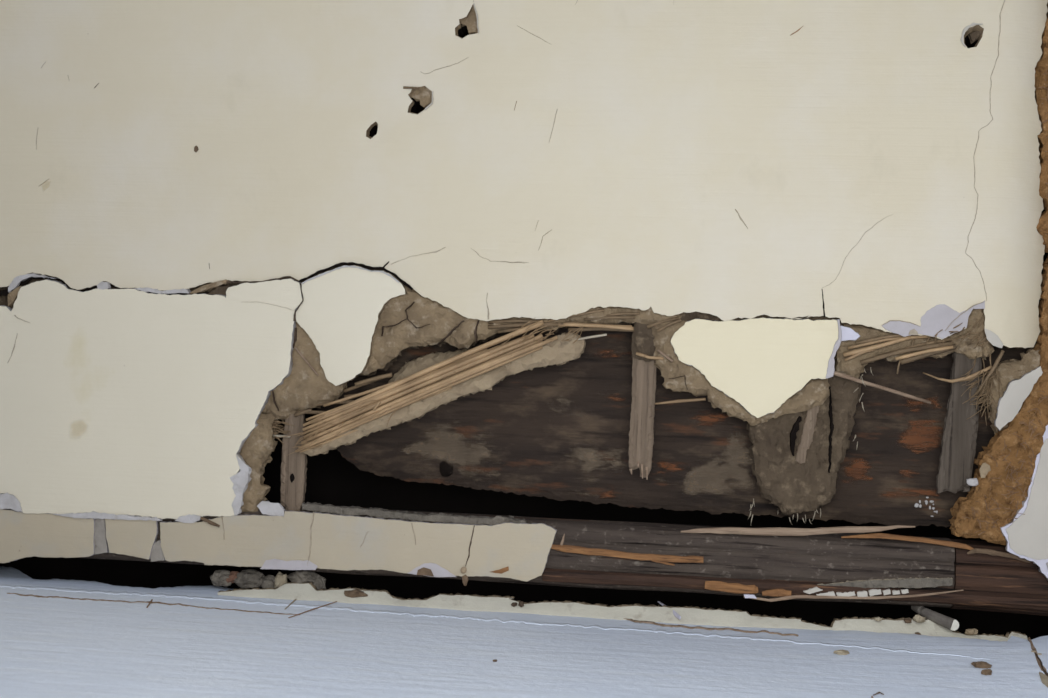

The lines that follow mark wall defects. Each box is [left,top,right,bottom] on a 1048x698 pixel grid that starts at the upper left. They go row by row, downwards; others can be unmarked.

crack [965,0,1005,301]
crack [0,247,446,362]
flaking render [230,3,1048,560]
crack [822,214,893,317]
peeling [803,577,953,597]
crack [1028,637,1048,687]